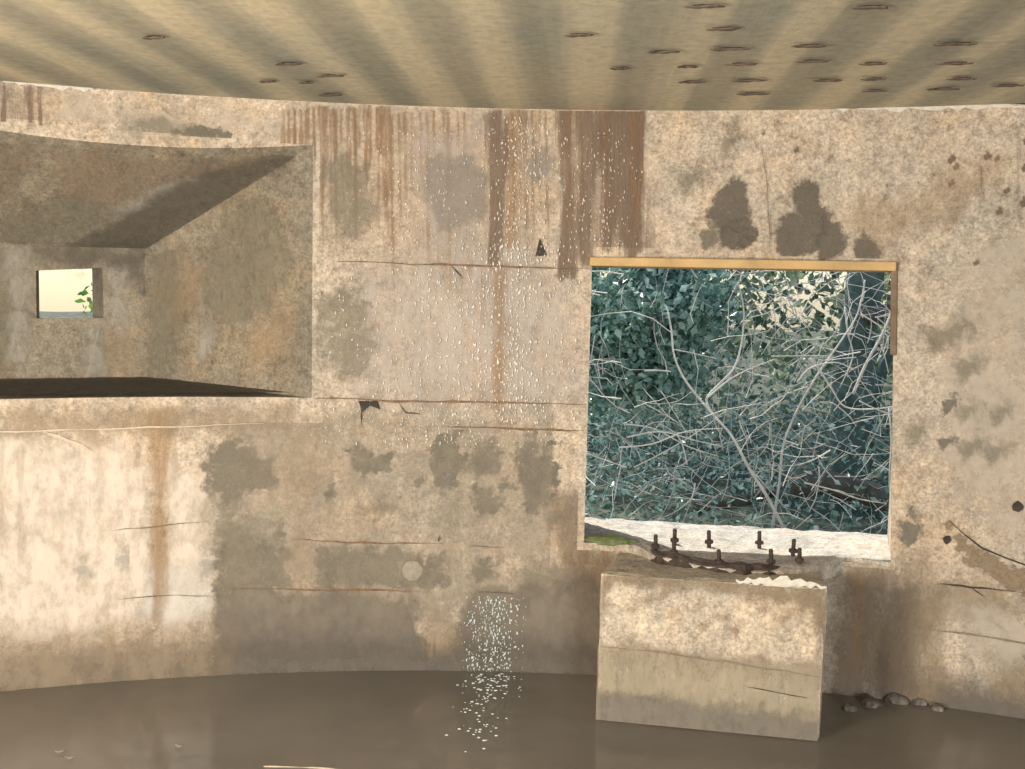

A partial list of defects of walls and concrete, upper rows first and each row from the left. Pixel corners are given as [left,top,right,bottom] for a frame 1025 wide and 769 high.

rust [28,87,42,125]
rust [281,107,337,181]
rust [353,107,405,189]
rust [488,110,645,281]
damp [701,177,758,250]
damp [776,180,882,260]
damp [313,116,648,523]
damp [0,439,826,741]